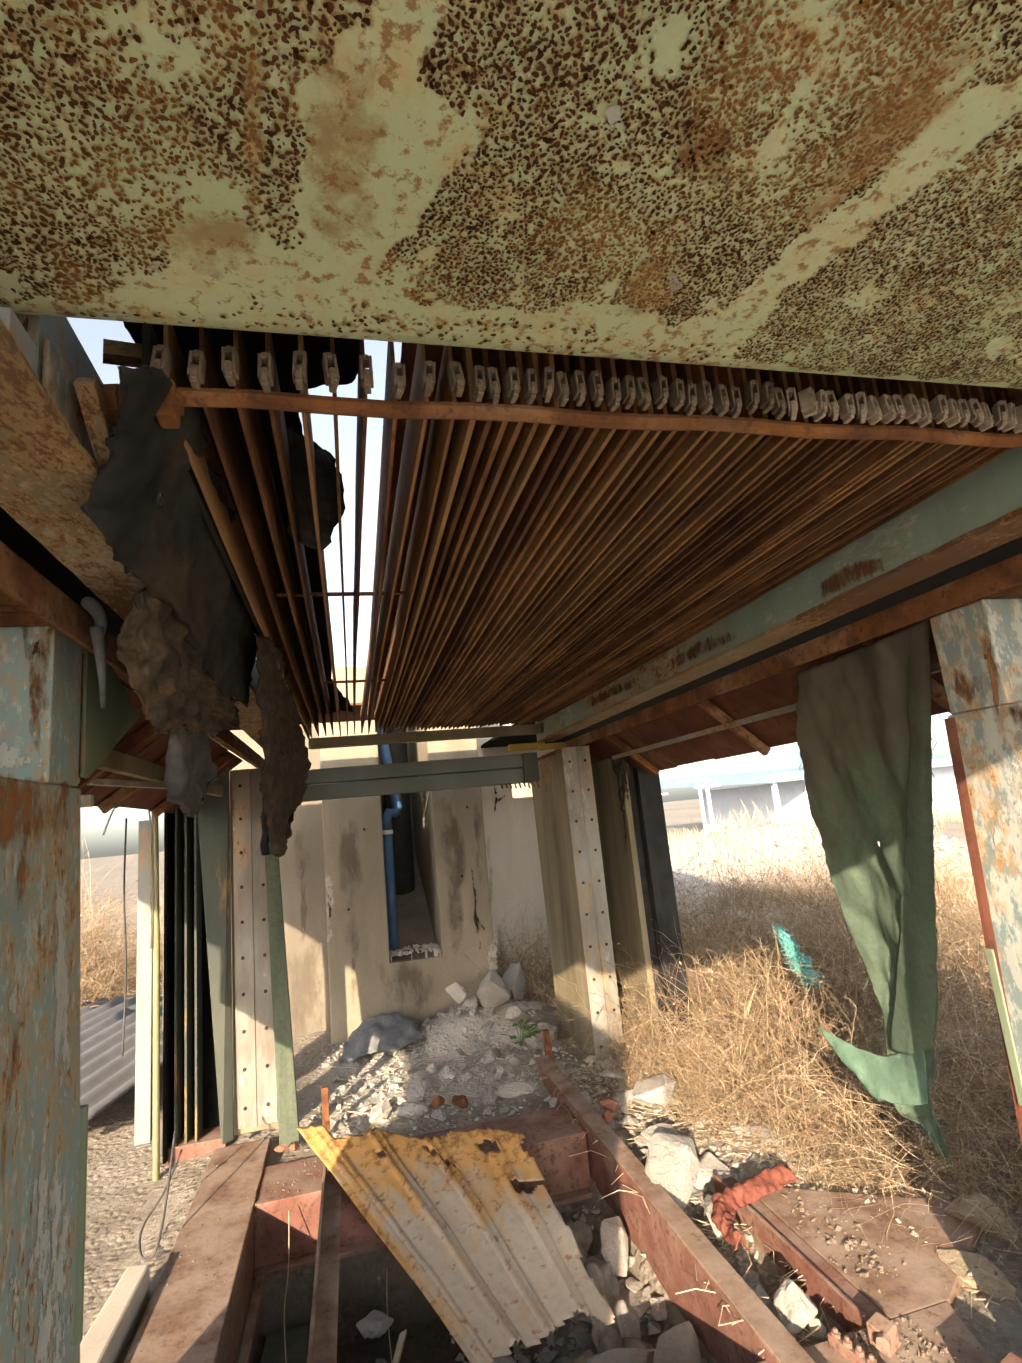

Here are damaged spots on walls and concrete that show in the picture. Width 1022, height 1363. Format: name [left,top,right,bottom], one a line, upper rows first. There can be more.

corrosion [676,114,734,184]
corrosion [821,561,883,596]
corrosion [24,628,51,738]
corrosion [954,640,1022,721]
corrosion [0,777,68,902]